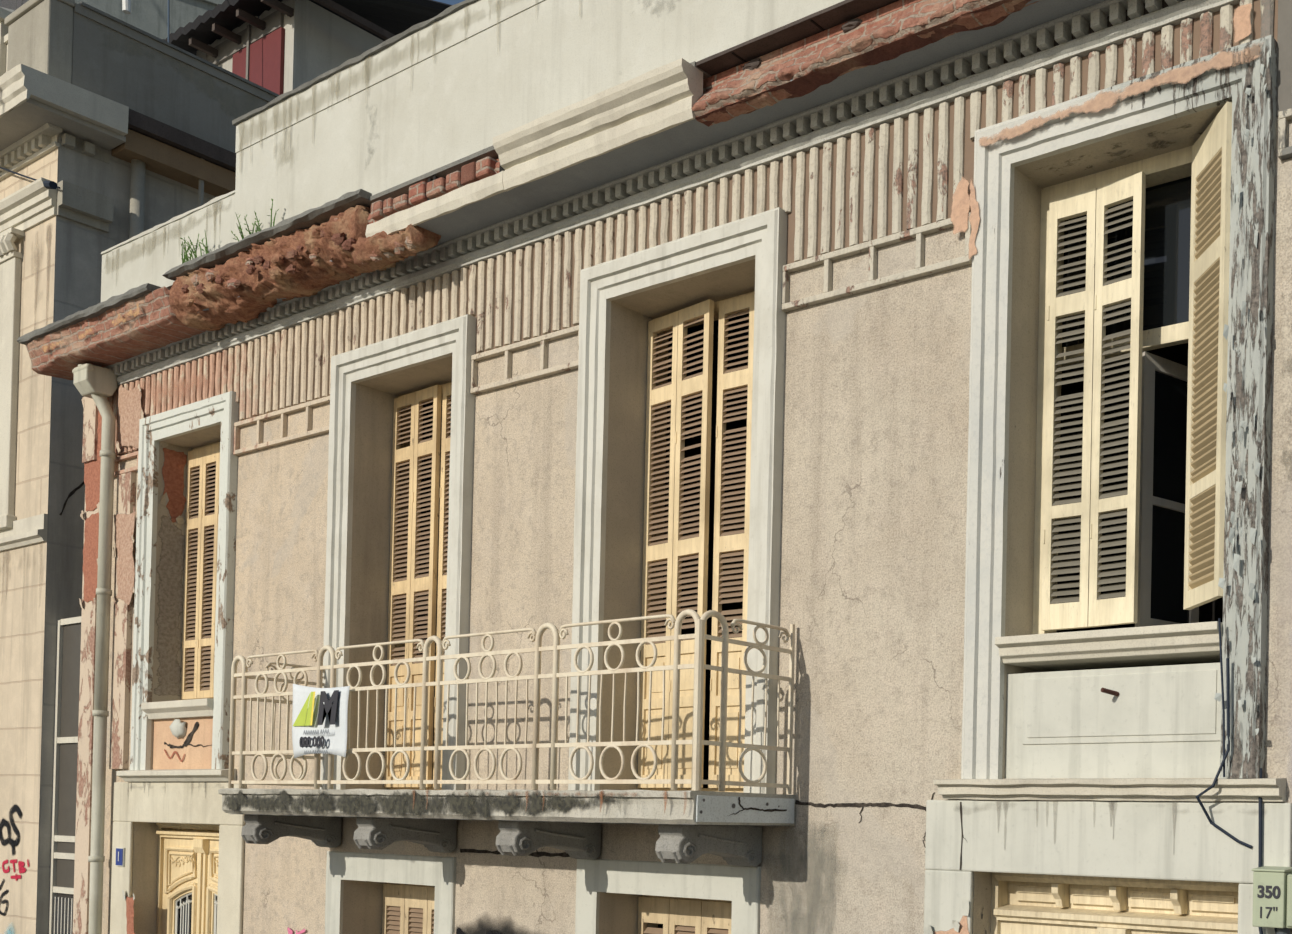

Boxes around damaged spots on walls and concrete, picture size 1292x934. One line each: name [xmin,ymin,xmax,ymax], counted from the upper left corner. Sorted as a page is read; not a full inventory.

peeling [1223,51,1269,346]
peeling [79,383,144,610]
peeling [154,441,193,696]
peeling [1218,411,1261,589]
crack [729,792,966,870]
peeling [1226,697,1259,763]